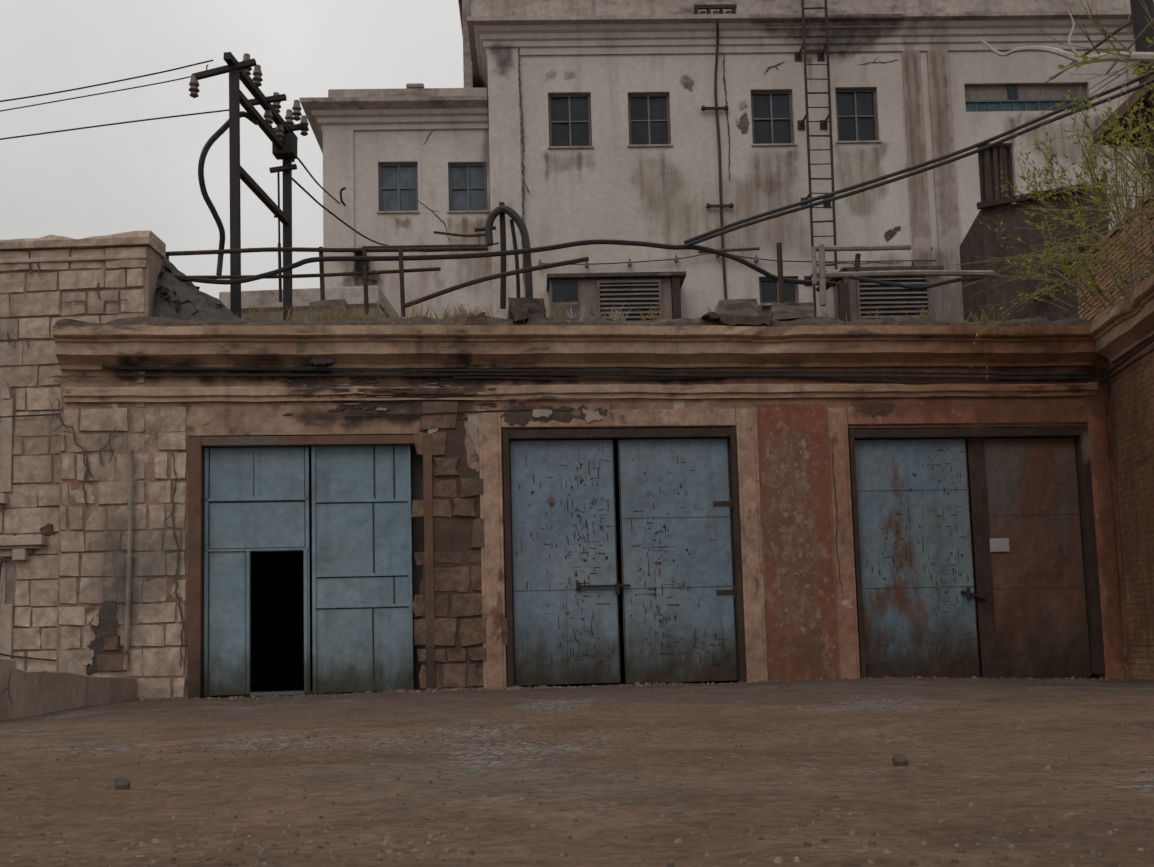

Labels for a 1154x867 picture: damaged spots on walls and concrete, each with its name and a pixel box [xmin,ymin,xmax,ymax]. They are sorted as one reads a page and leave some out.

crack [48,369,116,508]
spalling [284,356,607,691]
spalling [83,600,130,674]